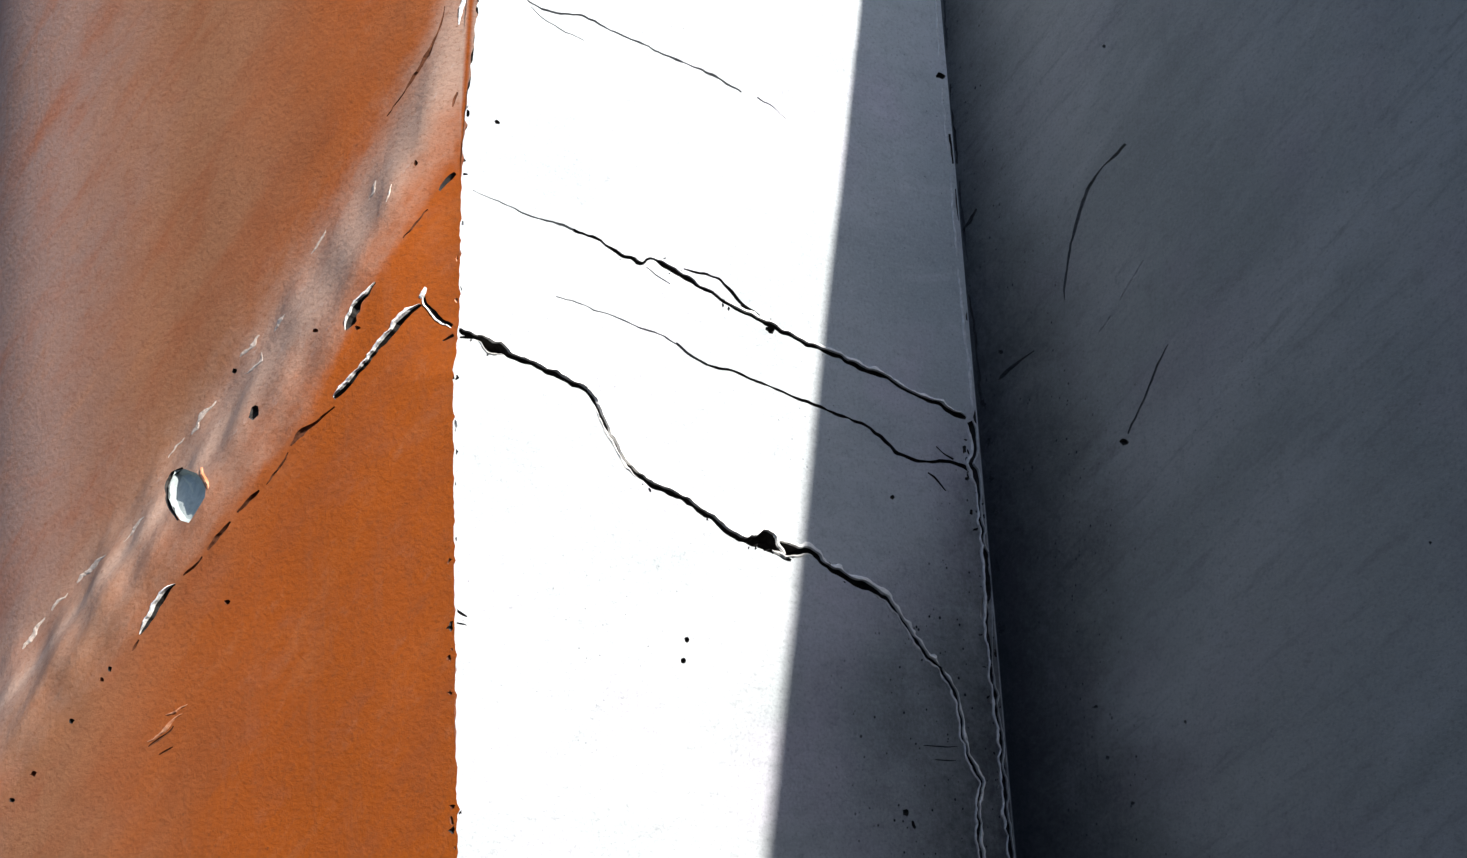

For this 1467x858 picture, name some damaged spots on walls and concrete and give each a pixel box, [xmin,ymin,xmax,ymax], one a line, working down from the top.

crack [100,0,1015,858]
peeling [165,438,209,523]
peeling [22,555,106,649]